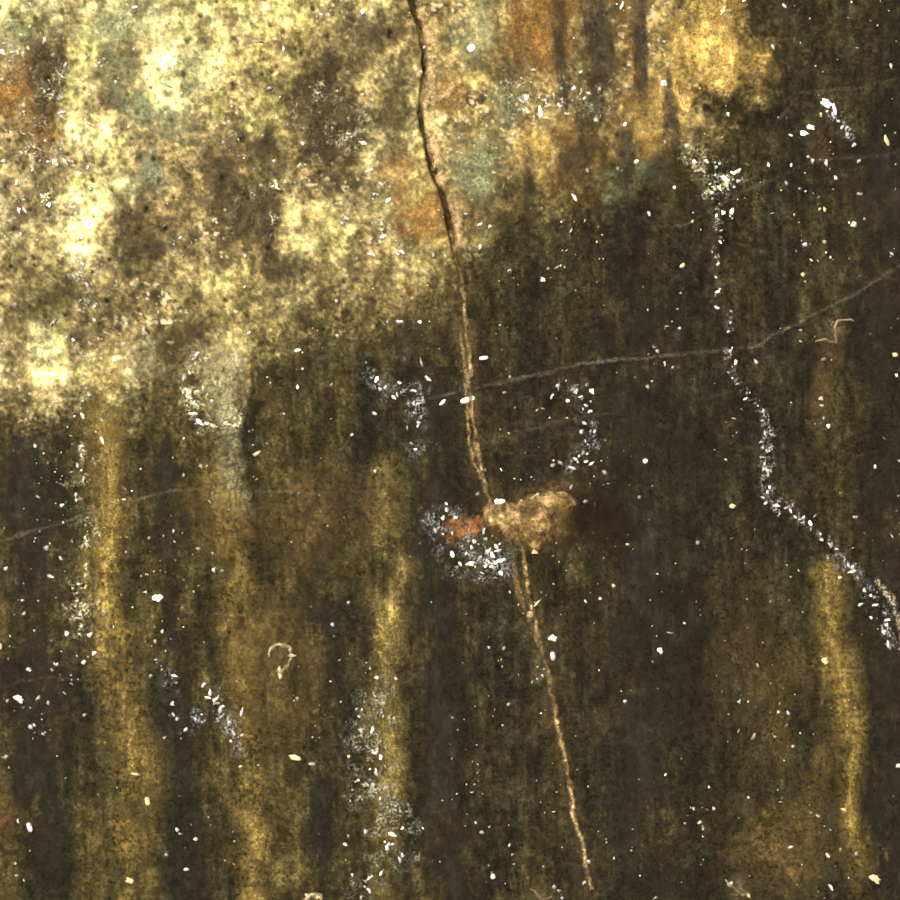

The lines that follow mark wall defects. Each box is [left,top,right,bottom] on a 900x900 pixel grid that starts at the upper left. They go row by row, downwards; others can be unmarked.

water stain [0,25,89,175]
water stain [285,2,389,187]
water stain [509,94,549,122]
water stain [553,0,617,138]
water stain [620,0,647,101]
water stain [10,250,97,325]
water stain [78,195,160,278]
water stain [208,127,307,281]
water stain [367,219,392,256]
crack [408,0,495,508]
corrosion [451,520,476,537]
crack [513,539,591,887]